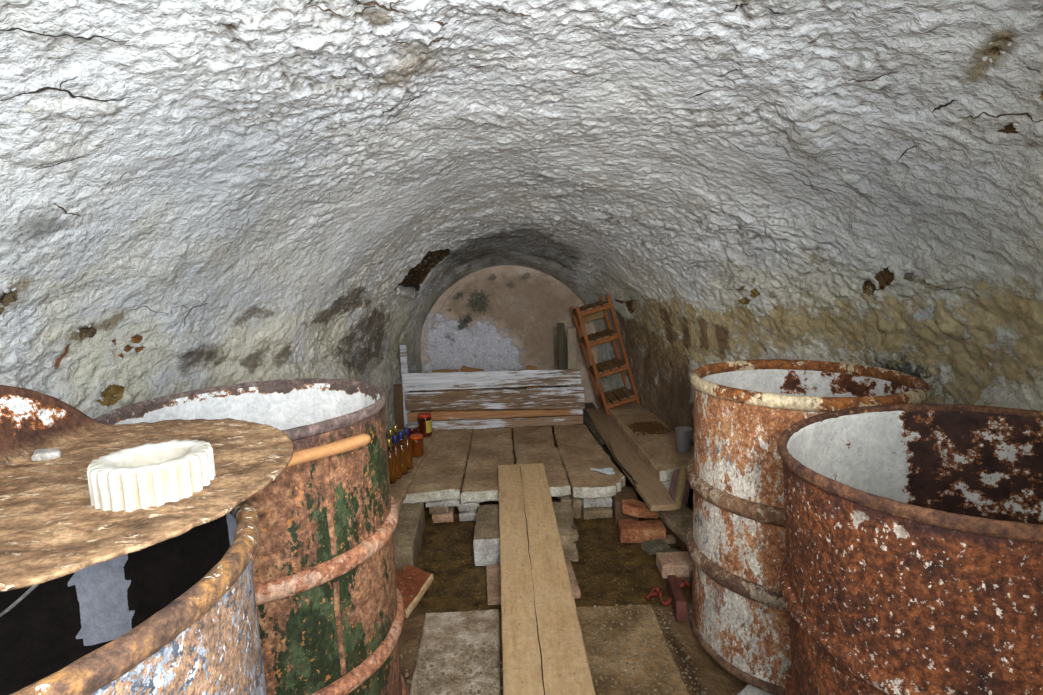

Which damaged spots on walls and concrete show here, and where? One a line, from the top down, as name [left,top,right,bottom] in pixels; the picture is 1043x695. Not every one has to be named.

crack [0,28,129,42]
crack [1,76,130,102]
spalling [860,266,916,297]
water stain [313,287,390,374]
water stain [179,344,226,368]
water stain [240,351,262,372]
water stain [275,346,291,363]
water stain [616,280,1043,446]